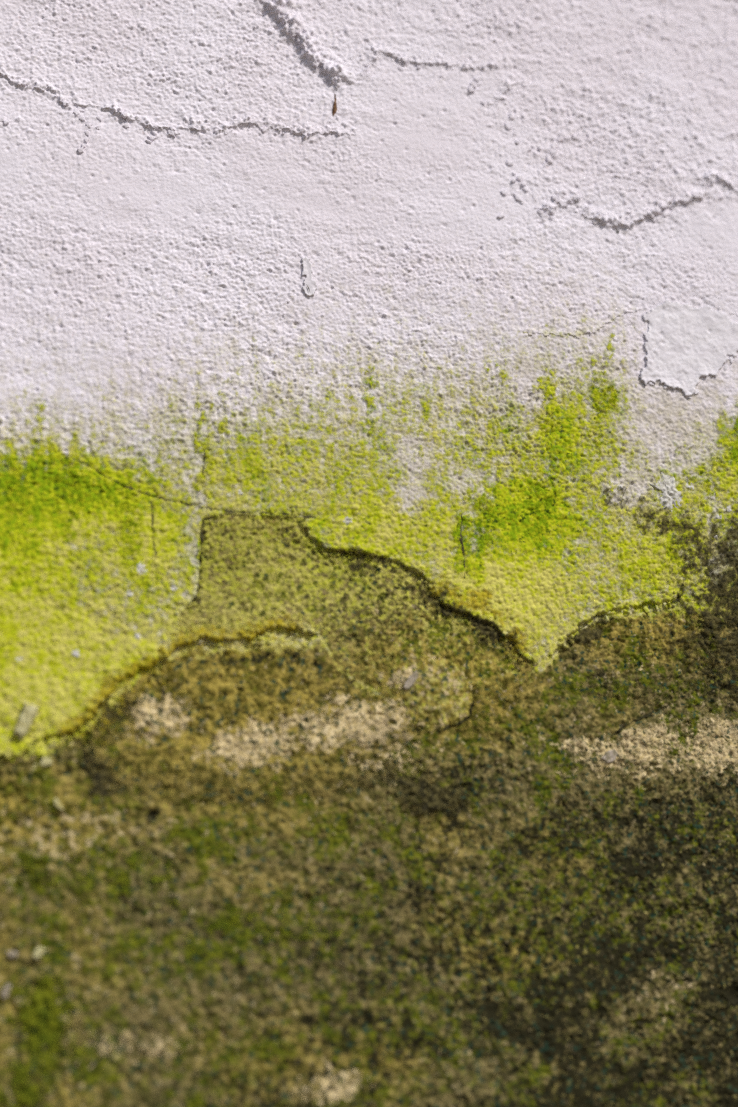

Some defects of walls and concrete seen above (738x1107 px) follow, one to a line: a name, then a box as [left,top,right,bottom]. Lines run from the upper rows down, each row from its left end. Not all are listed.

water stain [195,402,214,462]
water stain [363,367,381,439]
water stain [538,368,561,434]
water stain [586,333,617,444]
flaking render [523,300,738,398]
crack [65,447,313,605]
water stain [453,494,494,573]
water stain [348,548,524,665]
water stain [603,487,738,710]
water stain [560,615,619,688]
water stain [360,766,469,816]